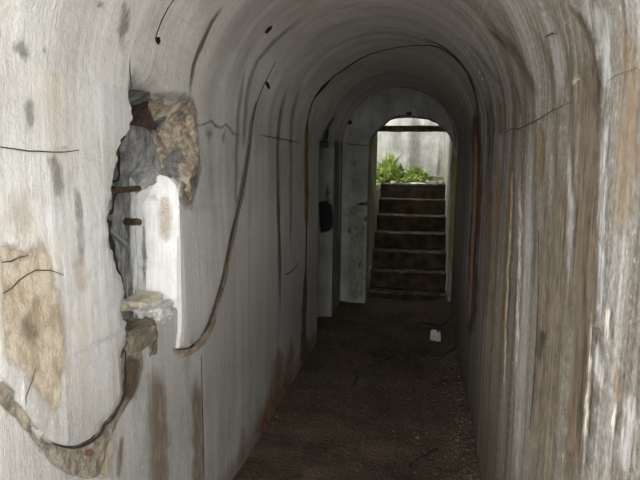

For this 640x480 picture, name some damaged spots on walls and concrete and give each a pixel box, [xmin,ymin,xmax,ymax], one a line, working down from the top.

crack [0,145,79,153]
spalling [0,83,200,479]
crack [155,0,174,45]
crack [176,39,479,366]
crack [504,102,570,133]
leakage [494,8,610,480]